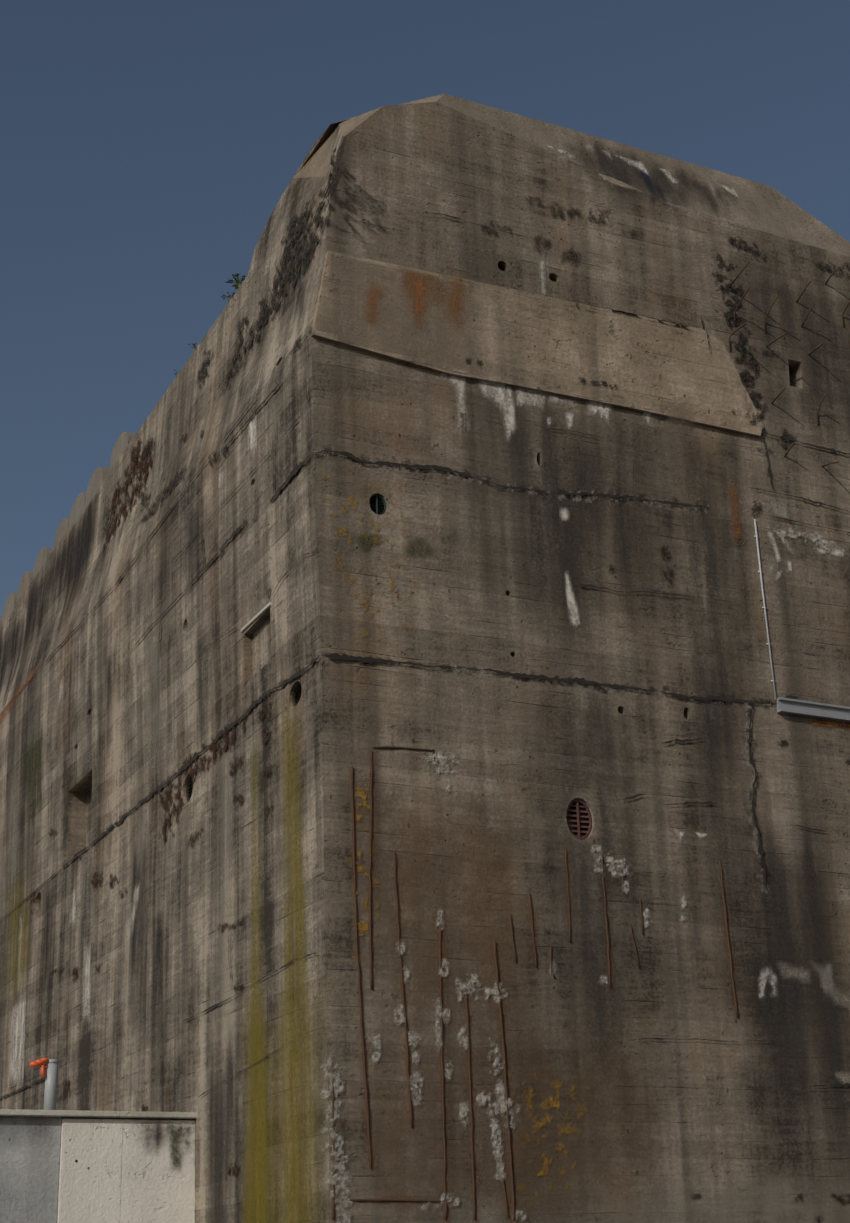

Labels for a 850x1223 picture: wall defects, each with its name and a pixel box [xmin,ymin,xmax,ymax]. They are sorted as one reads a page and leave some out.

damp [582,146,737,210]
damp [321,255,475,428]
crack [0,333,708,714]
damp [480,382,648,631]
damp [769,532,792,578]
crack [1,653,783,921]
corrosion [351,746,435,1169]
damp [372,812,544,1206]
damp [754,842,850,1104]
corrosion [331,1064,448,1219]